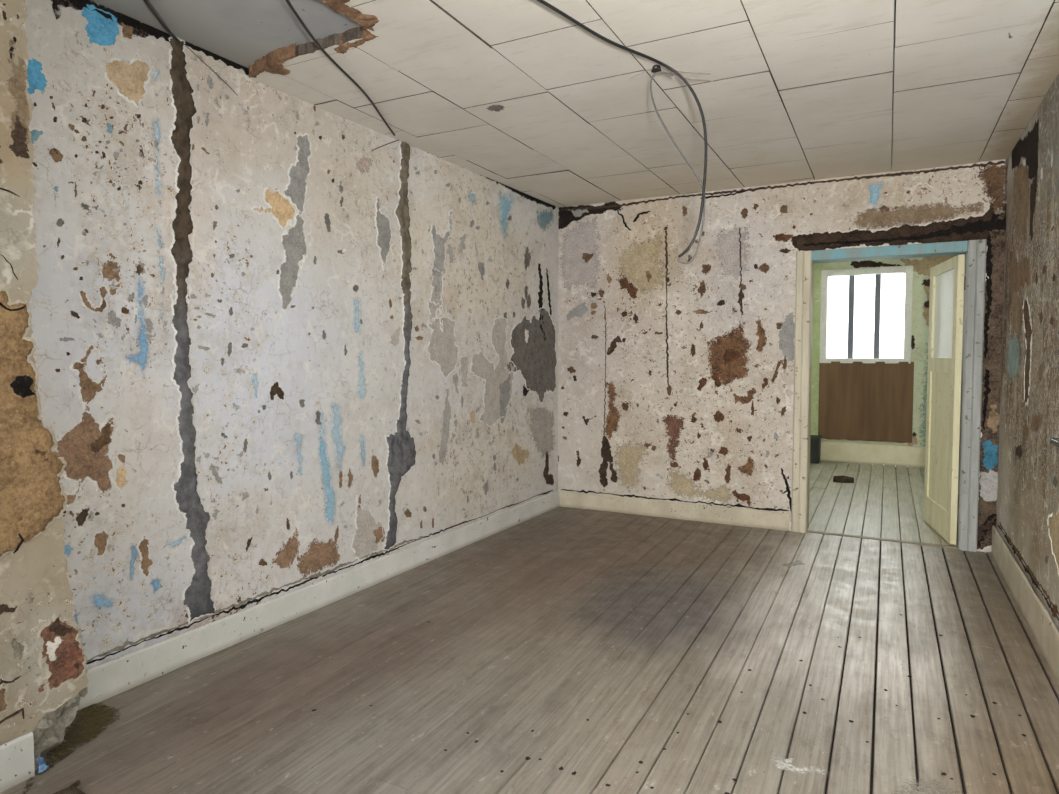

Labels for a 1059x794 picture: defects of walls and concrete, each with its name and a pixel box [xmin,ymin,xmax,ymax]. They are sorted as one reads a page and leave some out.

peeling [276,106,322,314]
peeling [374,197,392,271]
peeling [389,299,400,346]
peeling [415,197,577,465]
spalling [566,271,652,320]
peeling [607,336,626,355]
spalling [675,264,726,328]
spalling [0,286,127,560]
crack [86,468,792,665]
spalling [0,593,34,615]
spalling [0,676,24,724]
spalling [32,614,88,770]